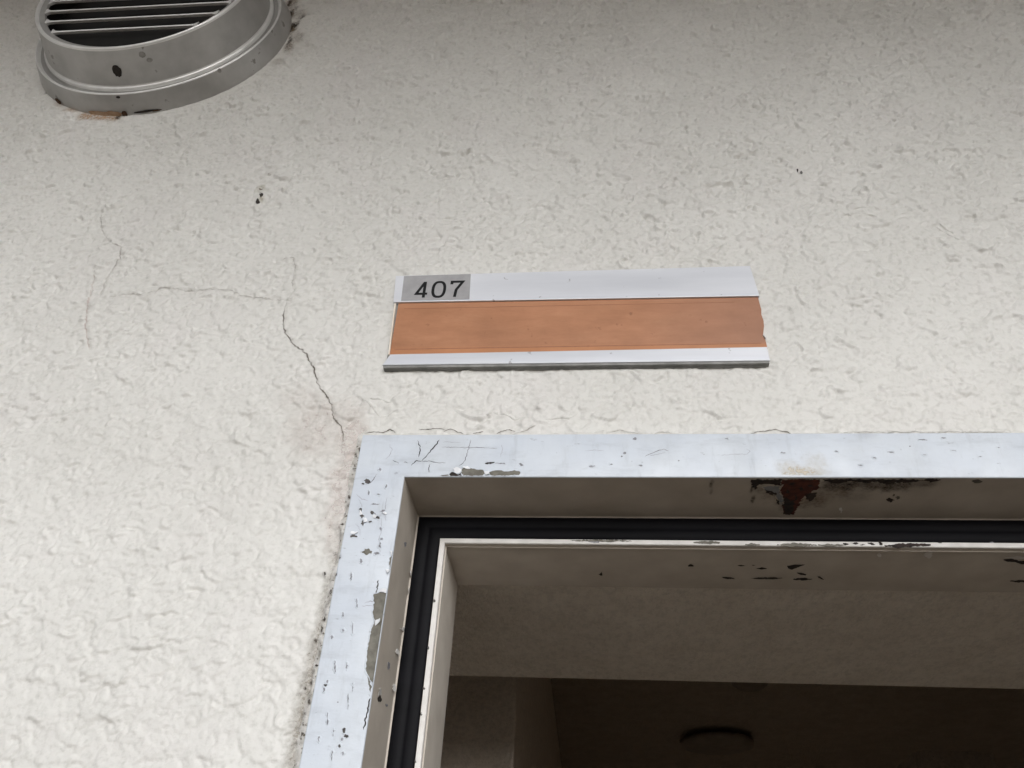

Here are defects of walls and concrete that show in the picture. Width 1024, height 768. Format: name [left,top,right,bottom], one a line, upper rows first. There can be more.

crack [84,209,536,470]
peeling [440,461,524,476]
rust [751,468,823,515]
peeling [721,563,825,581]
peeling [777,541,942,559]
peeling [330,467,400,730]
peeling [316,660,355,761]